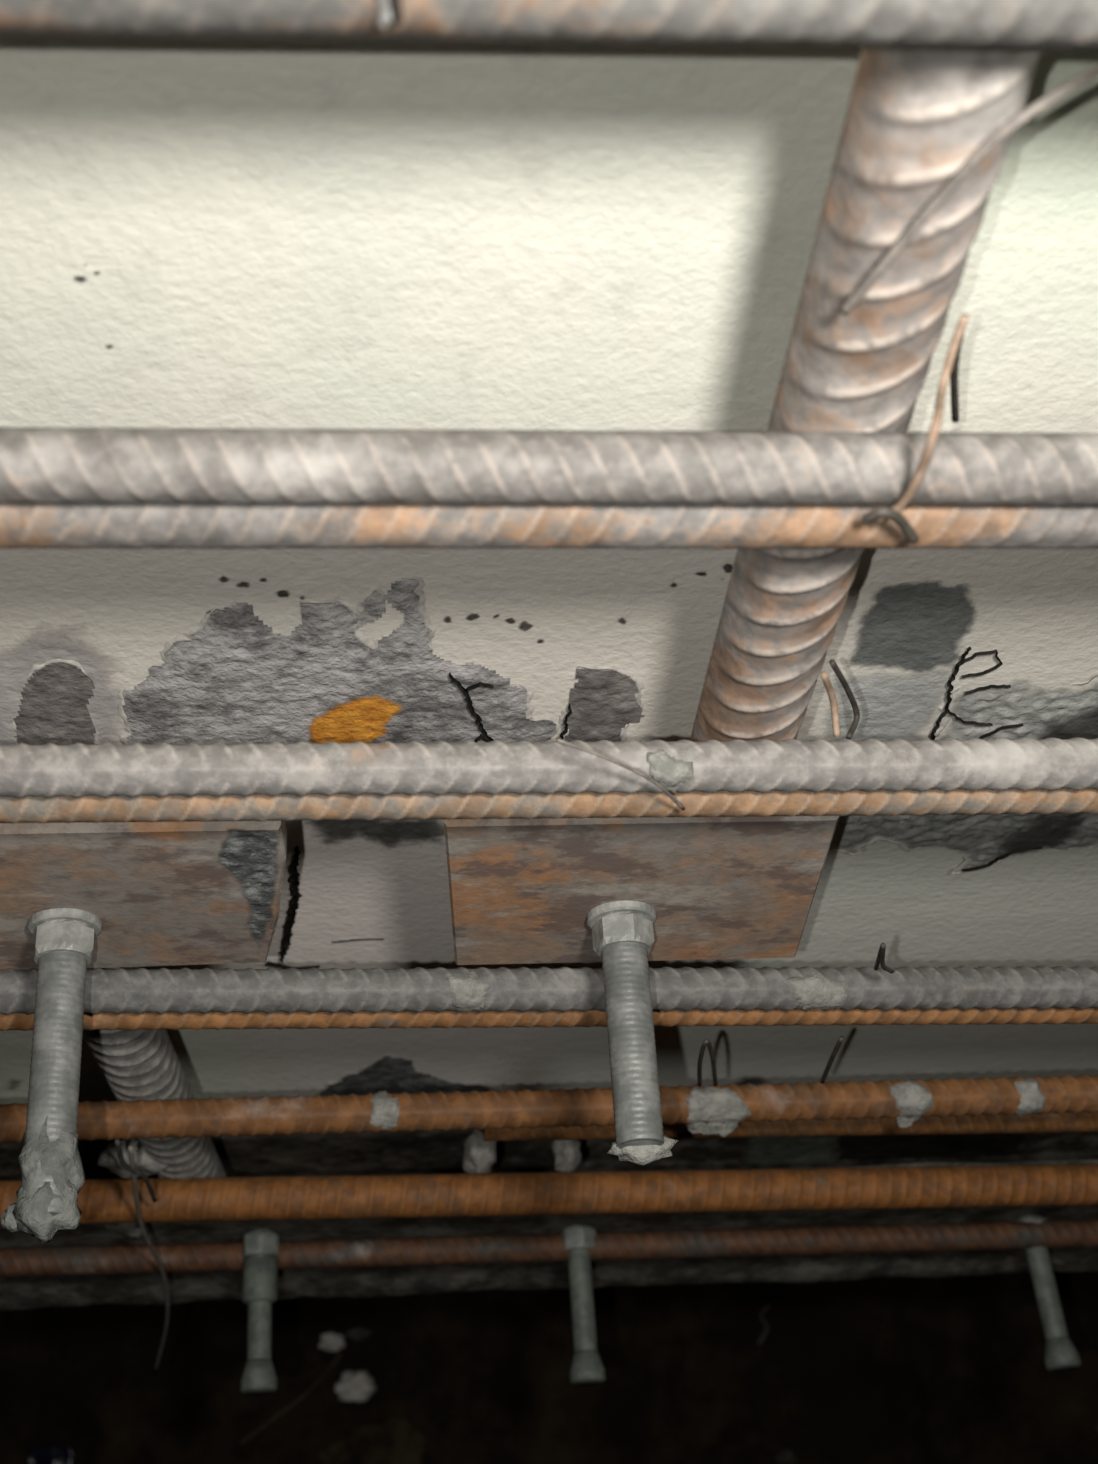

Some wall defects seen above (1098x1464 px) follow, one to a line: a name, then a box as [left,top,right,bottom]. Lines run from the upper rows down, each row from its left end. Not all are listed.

crack [389,0,403,24]
spalling [0,0,1098,874]
corrosion [310,696,401,743]
crack [931,647,1023,740]